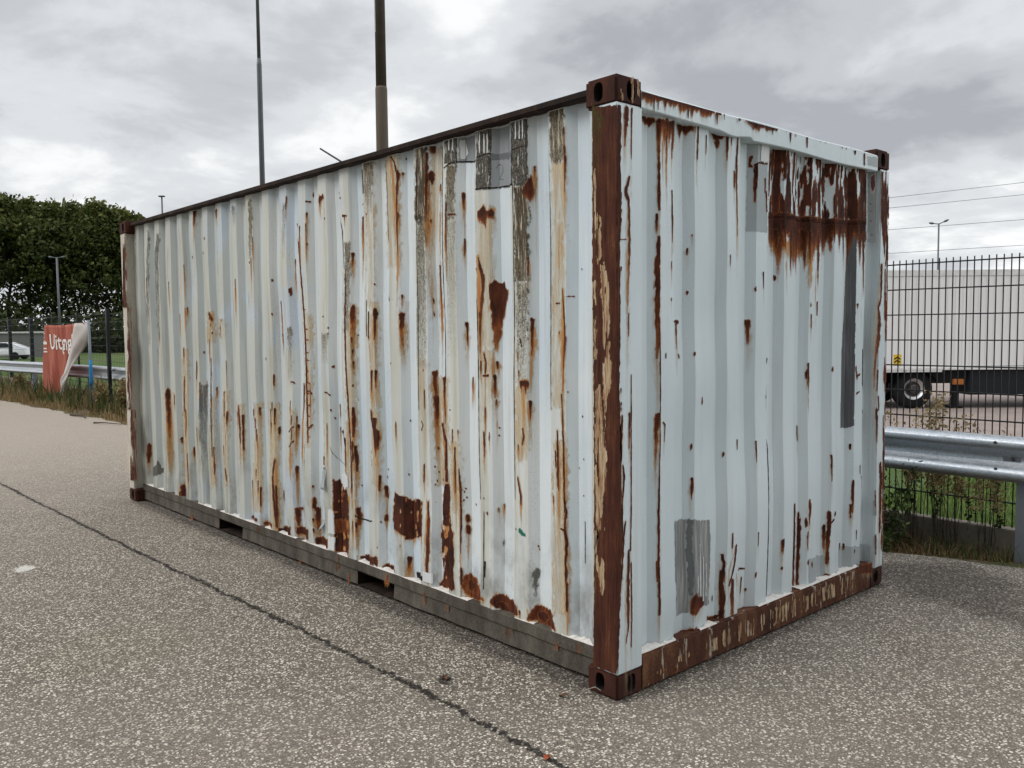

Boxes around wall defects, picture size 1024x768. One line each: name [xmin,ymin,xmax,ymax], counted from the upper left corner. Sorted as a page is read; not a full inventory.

peeling [444,129,492,190]
peeling [511,119,529,186]
crack [473,299,481,422]
rust [165,91,889,674]
crack [477,459,485,589]